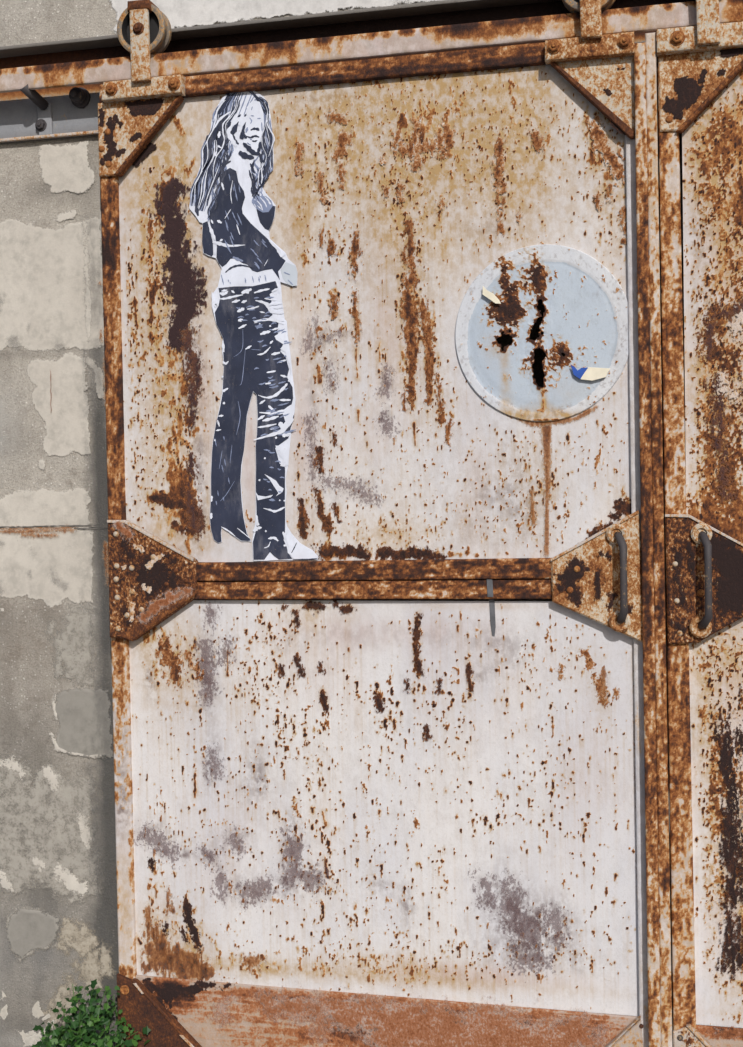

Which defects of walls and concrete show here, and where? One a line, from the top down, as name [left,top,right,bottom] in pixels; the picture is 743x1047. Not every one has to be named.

flaking render [109,0,135,34]
flaking render [150,0,441,29]
flaking render [38,140,95,193]
corrosion [98,98,164,167]
flaking render [0,209,105,470]
corrosion [147,175,208,431]
corrosion [399,217,455,447]
flaking render [0,487,101,687]
corrosion [297,430,447,561]
flaking render [0,755,115,1047]
corrosion [141,888,611,1047]
corrosion [703,668,743,980]